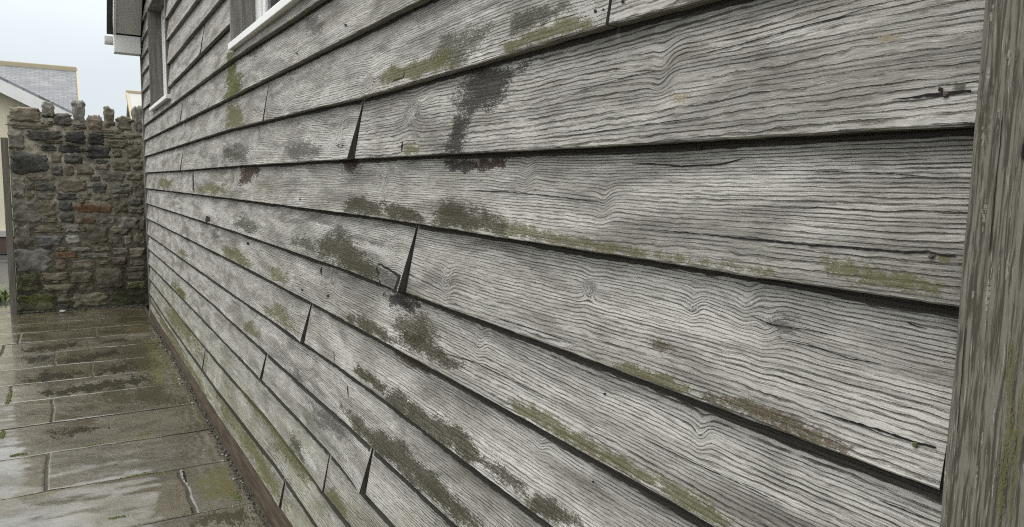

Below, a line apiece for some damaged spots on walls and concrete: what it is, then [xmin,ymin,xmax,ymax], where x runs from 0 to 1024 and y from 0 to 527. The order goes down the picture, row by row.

crack [893,90,971,100]
leakage [441,53,544,174]
leakage [382,291,422,314]